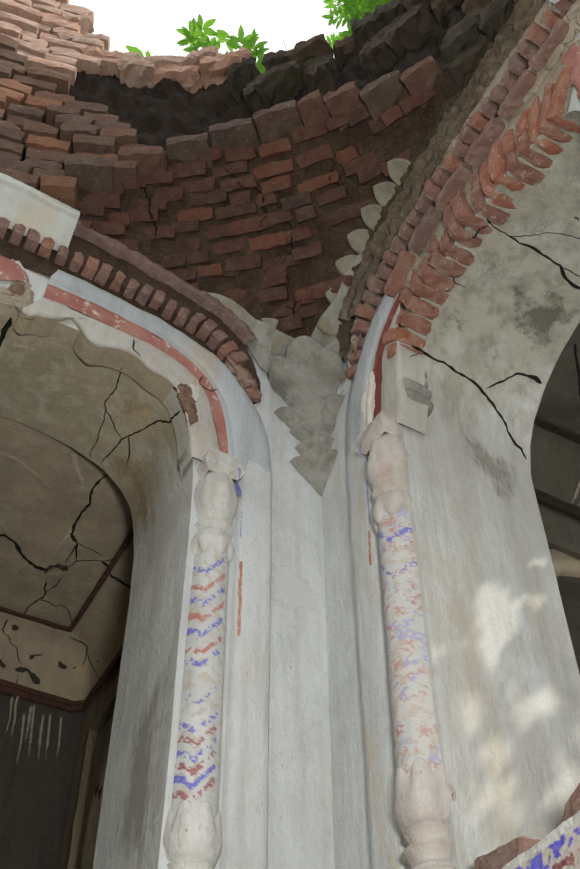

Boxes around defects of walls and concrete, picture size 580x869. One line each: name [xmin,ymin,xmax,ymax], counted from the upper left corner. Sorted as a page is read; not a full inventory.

crack [468,219,580,290]
spalling [0,255,34,320]
crack [0,317,12,347]
spalling [173,383,199,427]
crack [411,345,542,459]
crack [572,344,580,396]
crack [0,339,180,683]